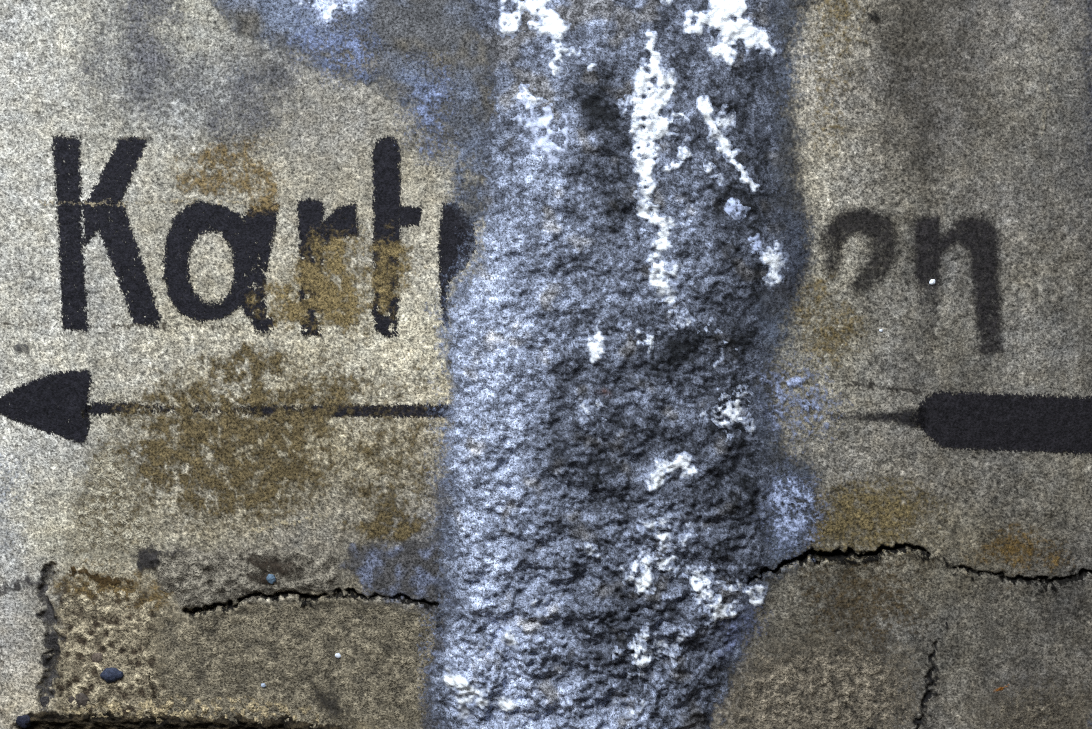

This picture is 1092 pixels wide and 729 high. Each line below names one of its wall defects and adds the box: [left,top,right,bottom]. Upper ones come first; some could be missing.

damp [120,0,207,111]
corrosion [176,135,279,214]
corrosion [247,230,413,335]
damp [206,0,852,729]
corrosion [98,342,441,542]
crack [185,588,445,627]
crack [749,543,1092,592]
crack [913,618,948,729]